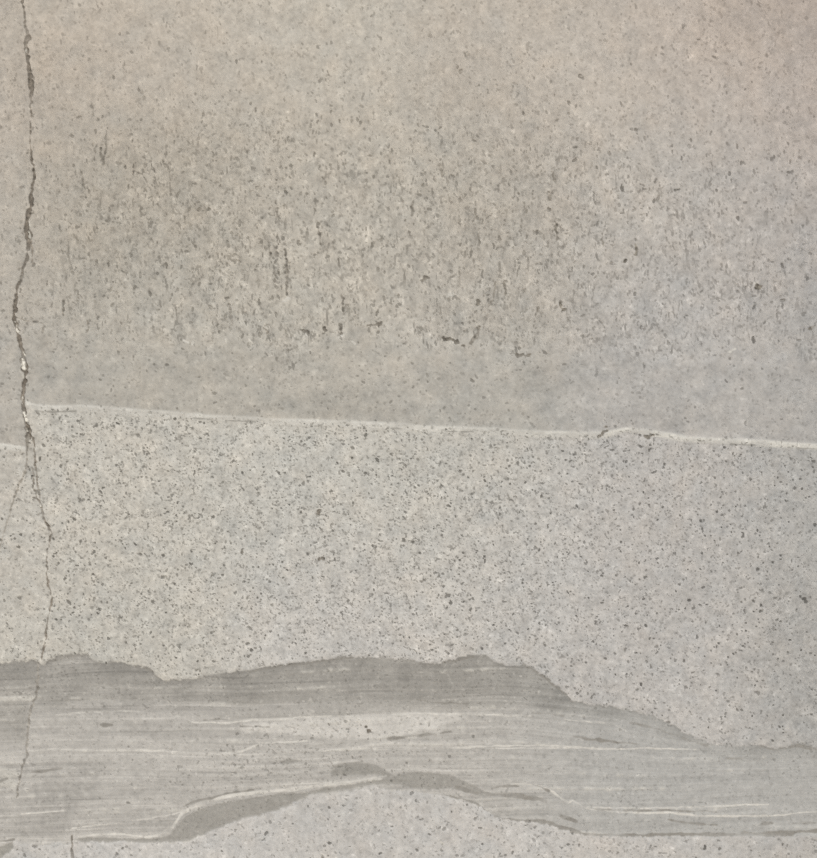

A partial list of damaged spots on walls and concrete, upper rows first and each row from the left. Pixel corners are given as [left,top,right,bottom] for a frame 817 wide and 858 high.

crack [0,0,54,799]
crack [68,835,76,858]